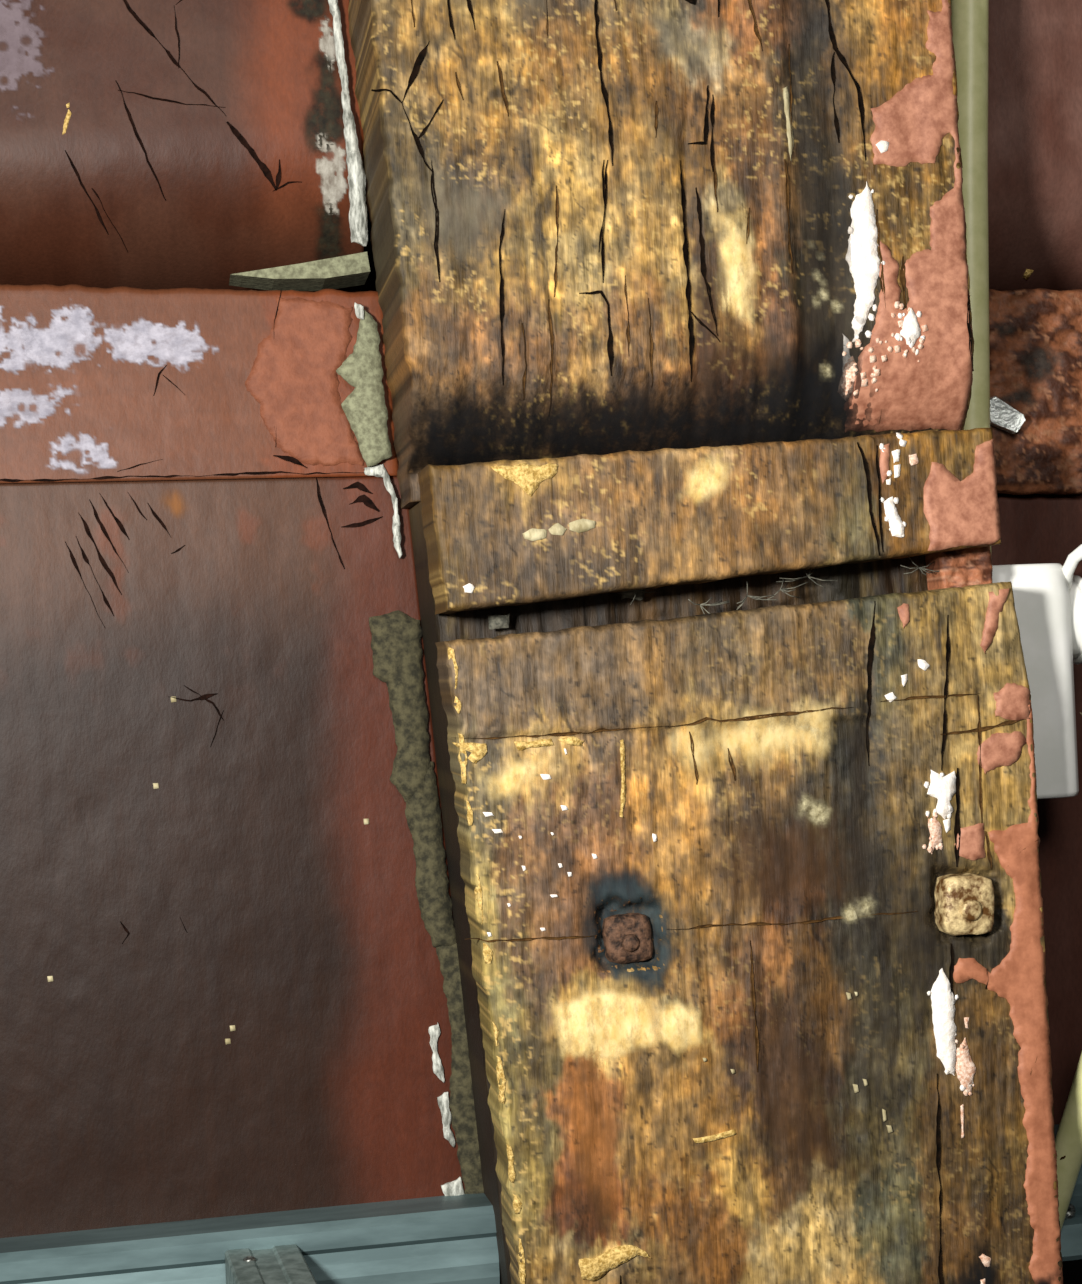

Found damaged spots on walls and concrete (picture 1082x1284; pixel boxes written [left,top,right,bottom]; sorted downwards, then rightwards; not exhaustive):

peeling [0,0,52,90]
peeling [0,387,72,428]
peeling [51,434,116,473]
peeling [0,306,218,373]
crack [0,427,383,626]
crack [115,0,299,201]
crack [371,0,475,282]
crack [499,0,653,412]
crack [680,85,750,377]
crack [825,0,866,160]
peeling [844,0,1001,551]
peeling [928,683,1063,1284]